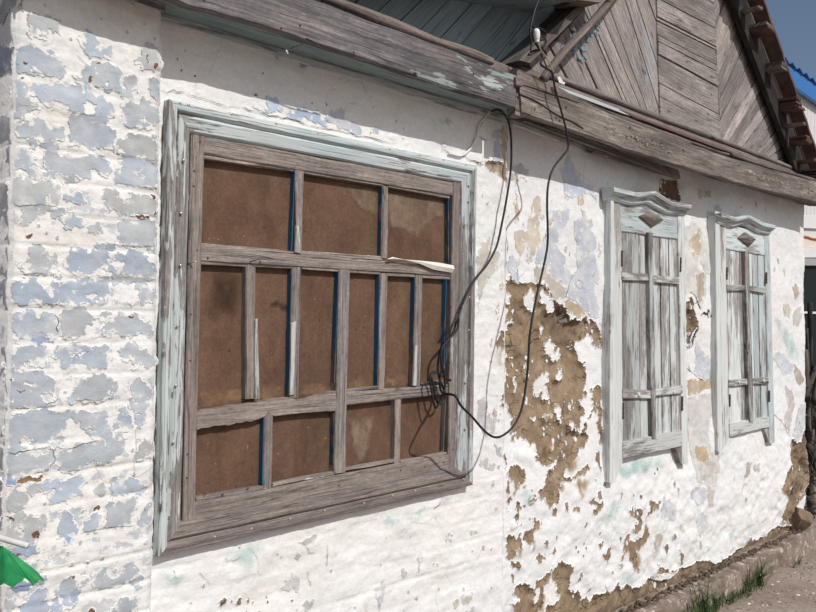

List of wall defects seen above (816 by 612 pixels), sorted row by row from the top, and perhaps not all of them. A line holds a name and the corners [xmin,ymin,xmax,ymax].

crack [118,76,394,290]
spalling [476,125,529,183]
peeling [0,0,164,612]
crack [83,312,159,548]
spalling [475,155,810,612]
spalling [216,595,269,612]
flaking render [280,572,315,612]
flaking render [452,586,476,612]